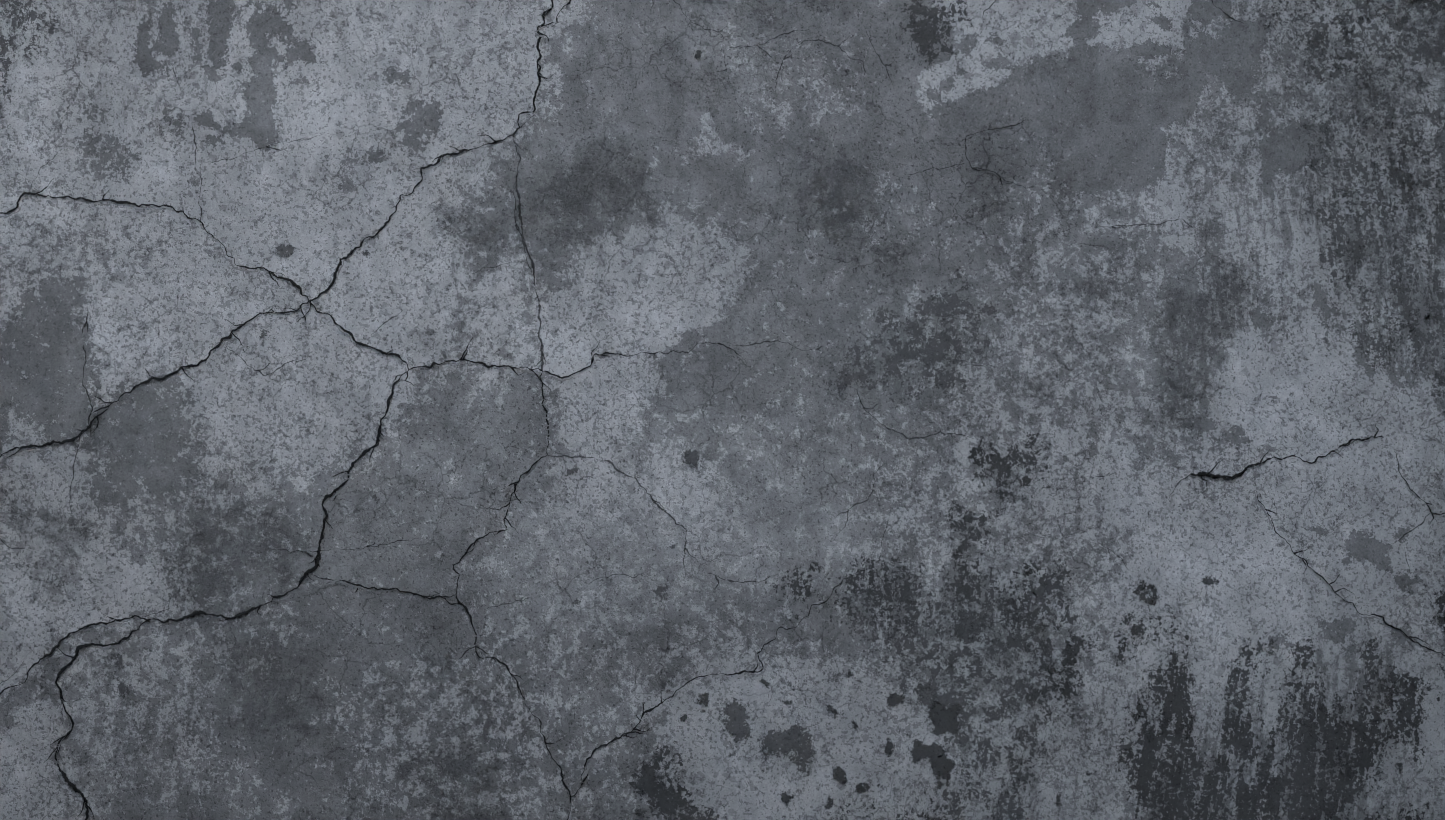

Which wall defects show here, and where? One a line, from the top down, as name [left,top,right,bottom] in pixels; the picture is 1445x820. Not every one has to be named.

crack [0,0,892,820]
crack [857,392,973,440]
crack [1170,424,1445,656]